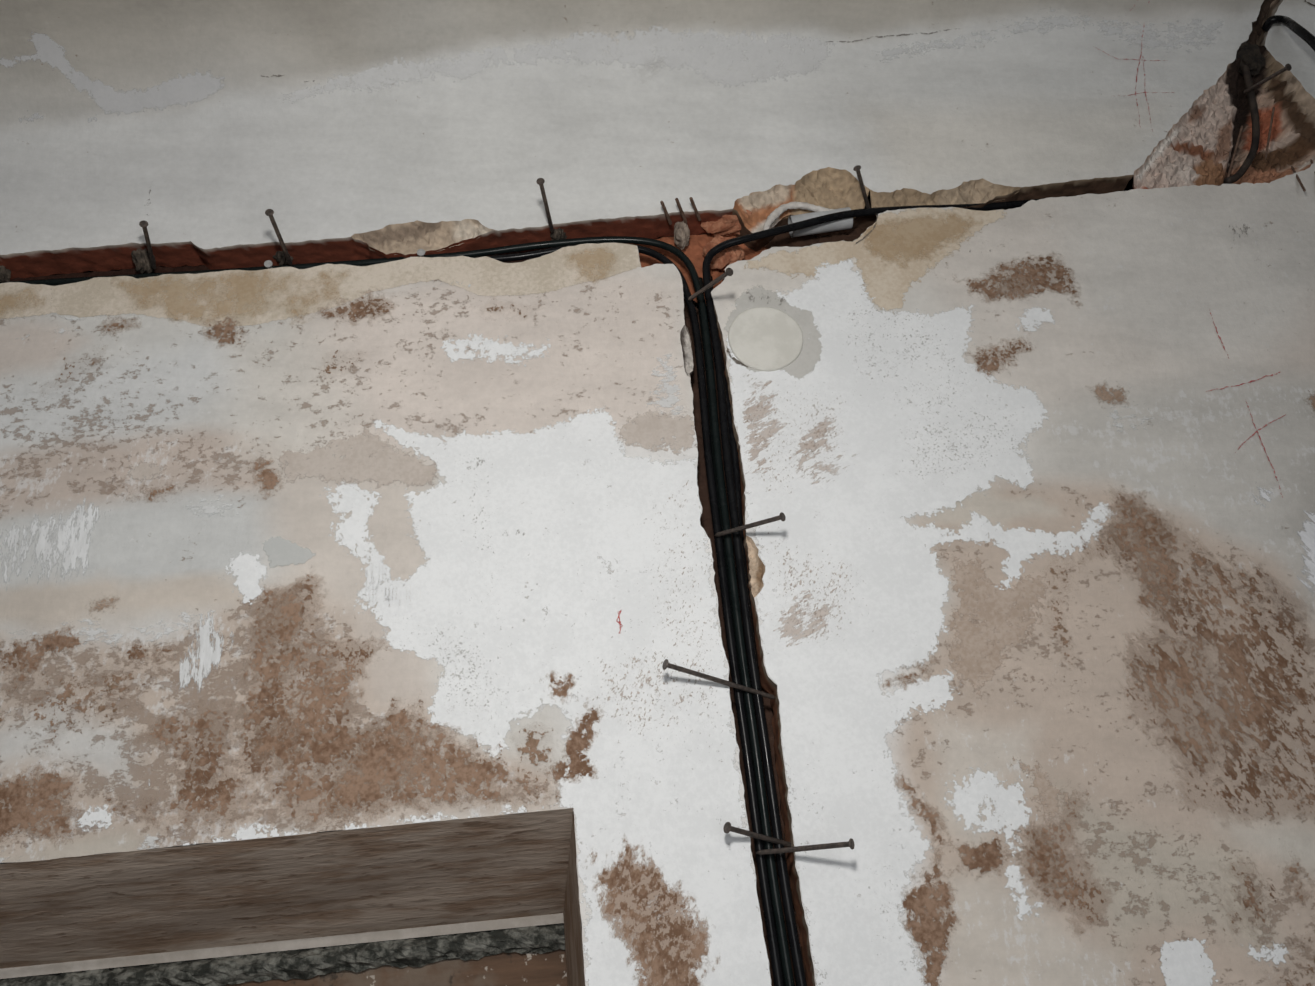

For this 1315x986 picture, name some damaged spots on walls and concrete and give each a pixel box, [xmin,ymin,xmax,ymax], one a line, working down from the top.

flaking render [1133,45,1315,189]
peeling [320,291,394,330]
flaking render [351,219,494,255]
flaking render [680,325,694,378]
flaking render [733,167,1022,233]
peeling [966,255,1080,305]
peeling [0,627,173,842]
peeling [107,574,600,834]
peeling [1080,492,1315,817]
peeling [591,839,718,986]
peeling [895,776,1003,986]
peeling [1011,756,1107,934]